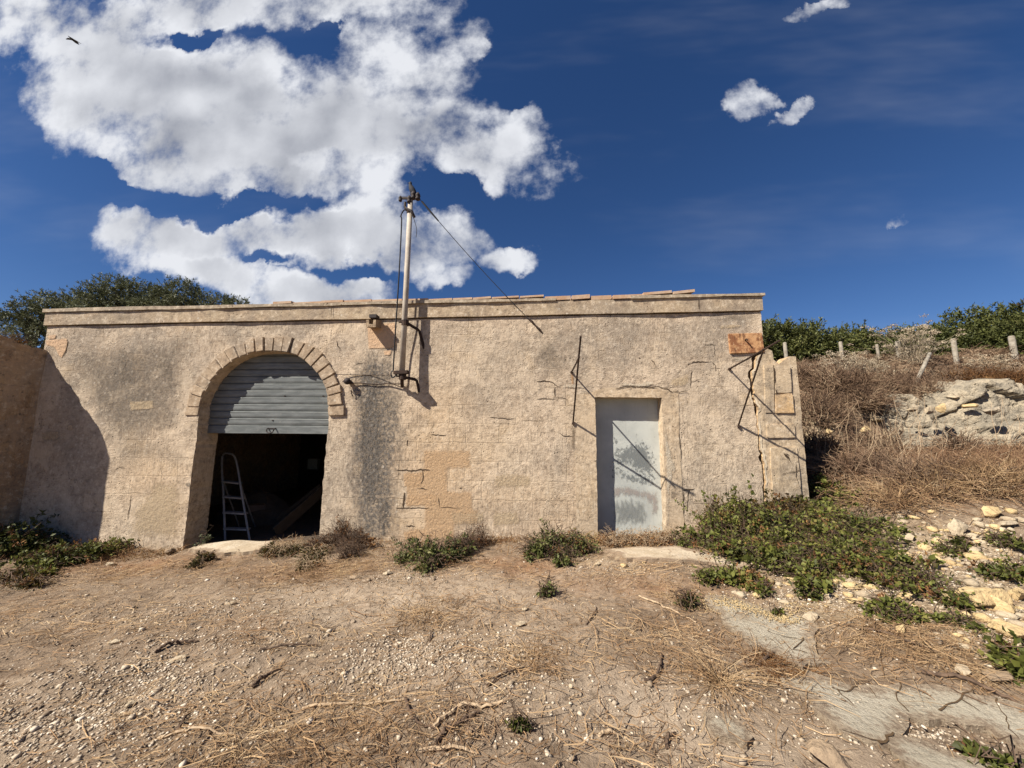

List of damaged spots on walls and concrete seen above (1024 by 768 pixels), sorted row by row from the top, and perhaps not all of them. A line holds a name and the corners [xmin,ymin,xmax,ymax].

leakage [351,357,404,539]
crack [616,344,803,499]